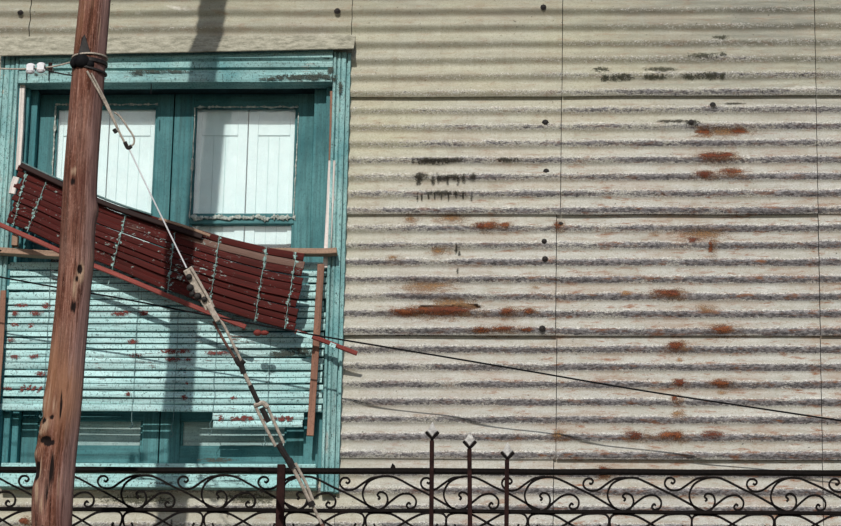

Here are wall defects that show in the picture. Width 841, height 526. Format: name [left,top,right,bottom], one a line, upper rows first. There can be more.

corrosion [695,126,749,137]
corrosion [694,152,742,181]
corrosion [472,221,509,231]
peeling [10,302,51,328]
corrosion [391,282,476,322]
corrosion [472,308,539,337]
peeling [160,349,192,362]
corrosion [627,431,688,443]